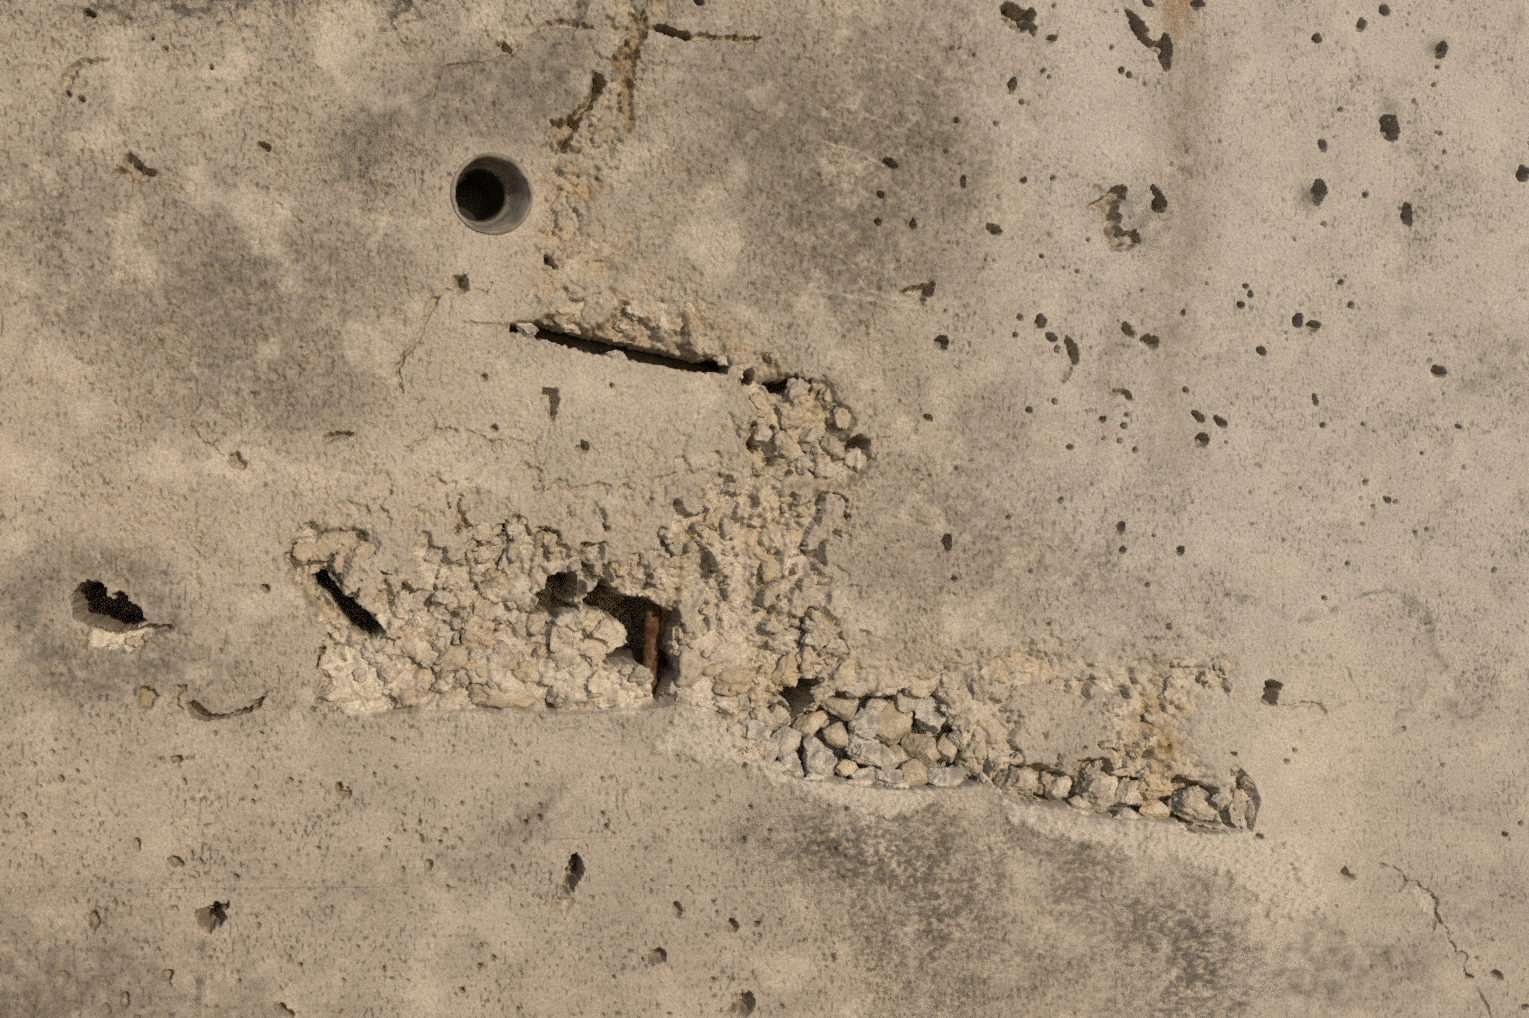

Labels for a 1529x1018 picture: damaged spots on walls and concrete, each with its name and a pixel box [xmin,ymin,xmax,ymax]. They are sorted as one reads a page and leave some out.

spalling [450,273,493,298]
spalling [501,294,813,396]
spalling [1059,333,1081,385]
spalling [1120,321,1159,354]
spalling [540,386,561,425]
spalling [746,421,776,454]
spalling [844,434,871,452]
spalling [285,522,386,642]
spalling [71,579,174,666]
spalling [528,571,681,703]
spalling [778,676,824,714]
crack [1379,863,1492,1018]